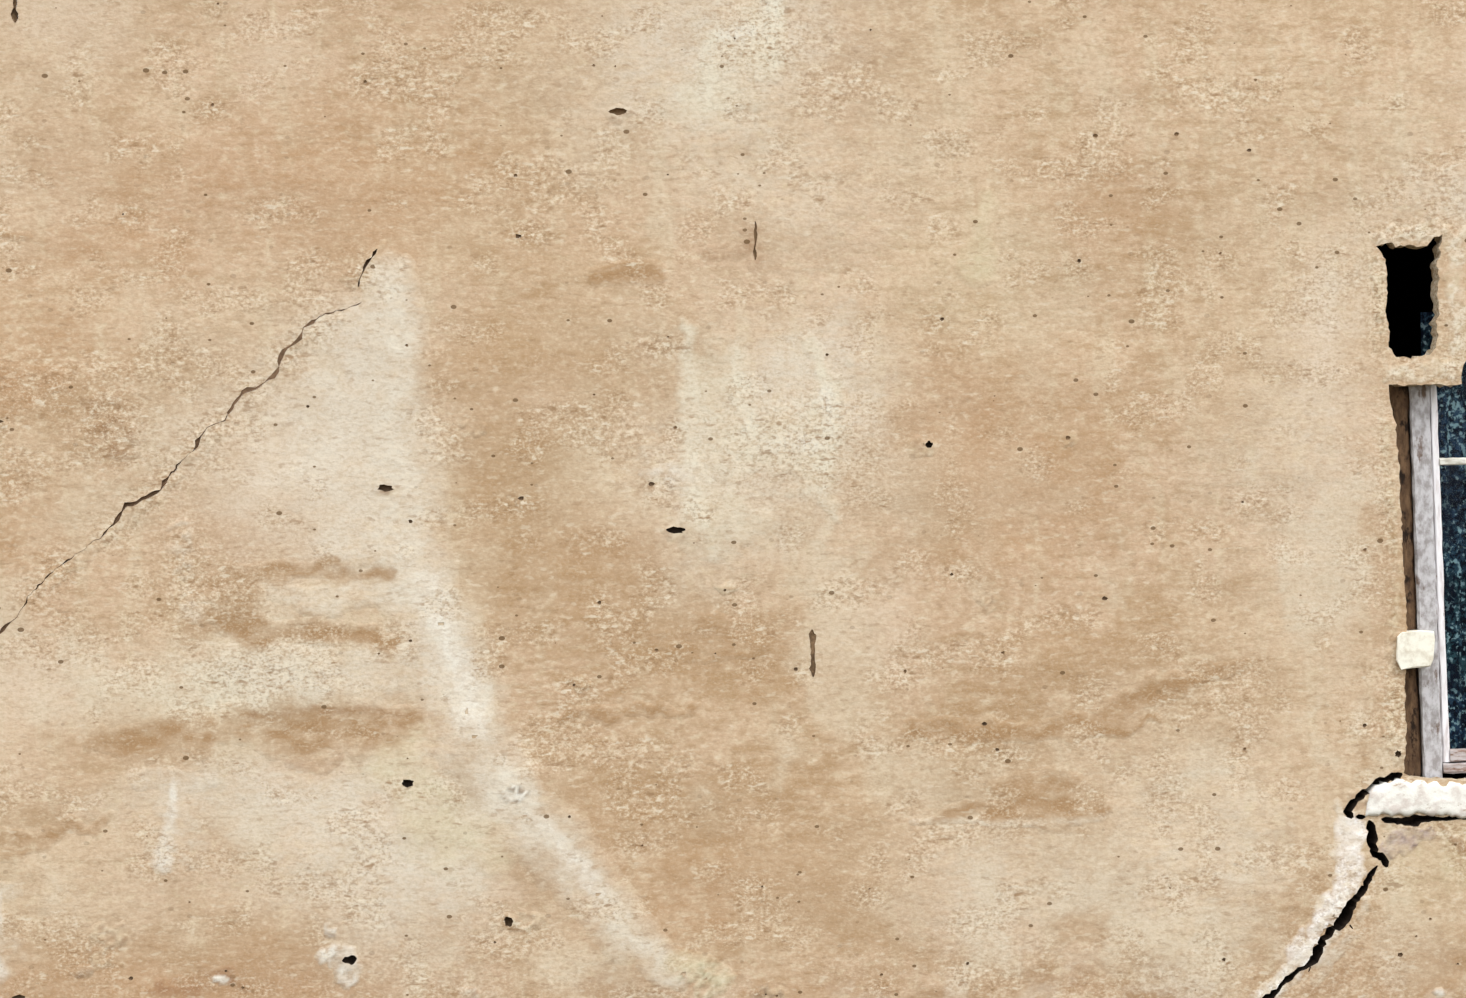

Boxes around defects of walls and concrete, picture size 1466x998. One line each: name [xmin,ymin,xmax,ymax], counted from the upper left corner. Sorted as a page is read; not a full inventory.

spalling [1367,216,1466,385]
crack [0,239,387,649]
crack [1249,772,1466,998]